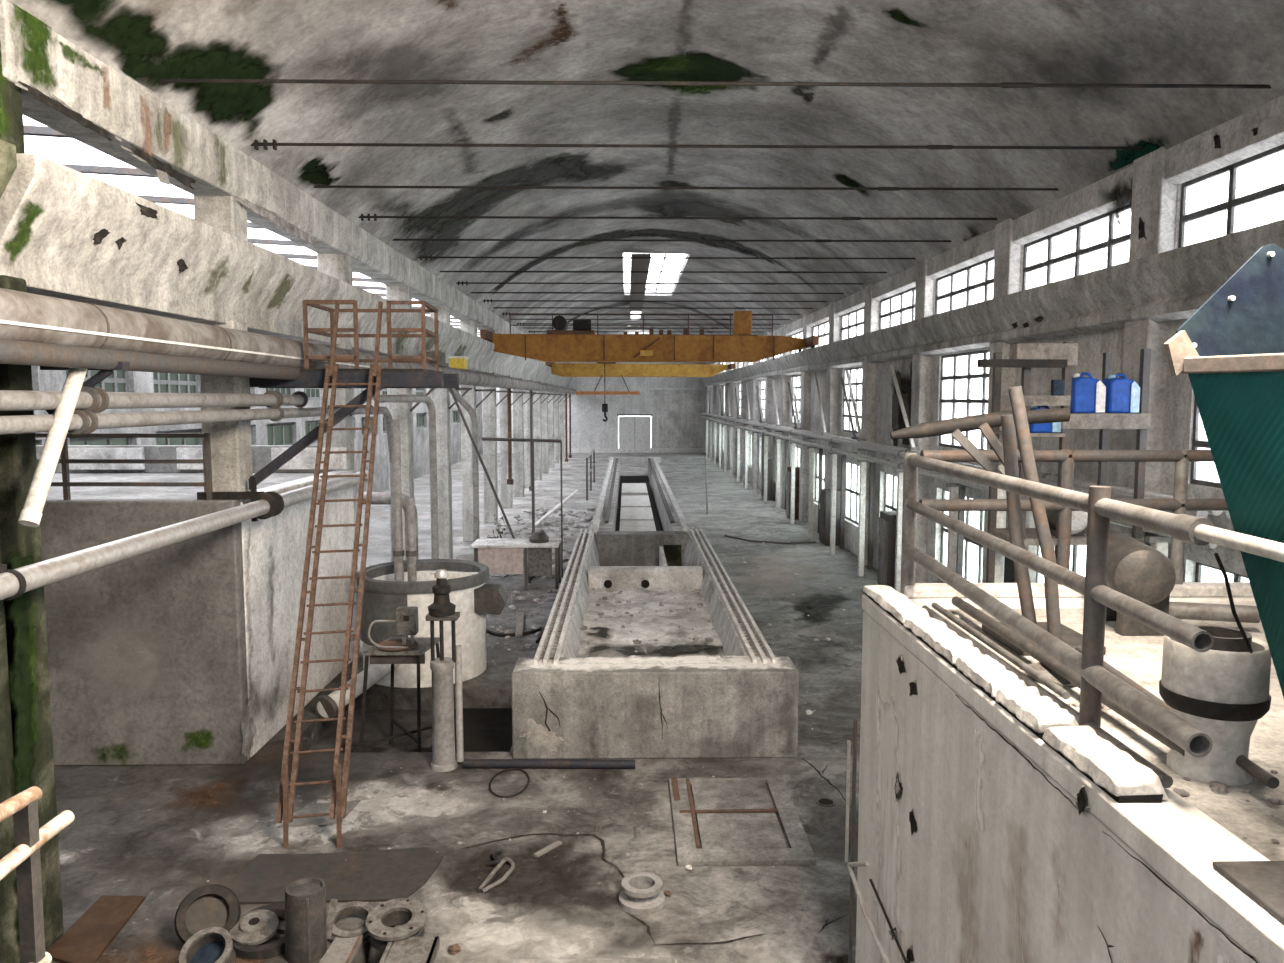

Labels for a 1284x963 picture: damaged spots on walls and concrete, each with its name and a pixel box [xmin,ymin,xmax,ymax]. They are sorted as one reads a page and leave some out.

leakage [375,153,626,263]
leakage [484,98,809,294]
crack [539,692,560,731]